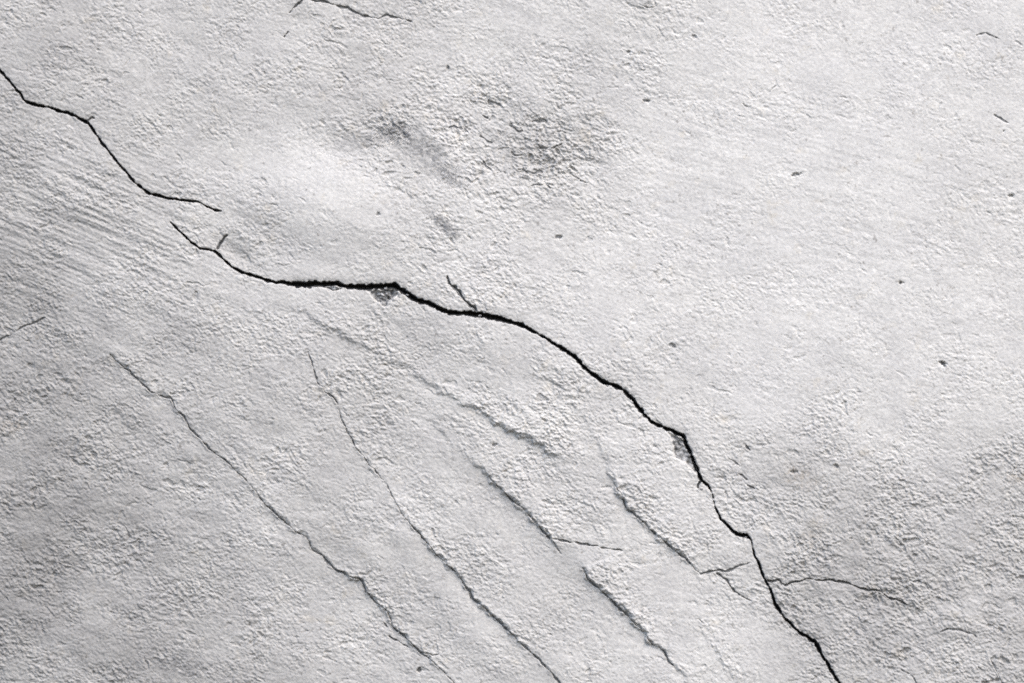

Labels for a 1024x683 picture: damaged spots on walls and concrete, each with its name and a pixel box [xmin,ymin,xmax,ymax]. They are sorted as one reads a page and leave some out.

crack [284,0,412,37]
crack [0,69,221,212]
crack [0,317,45,340]
crack [110,354,439,659]
crack [170,222,929,683]